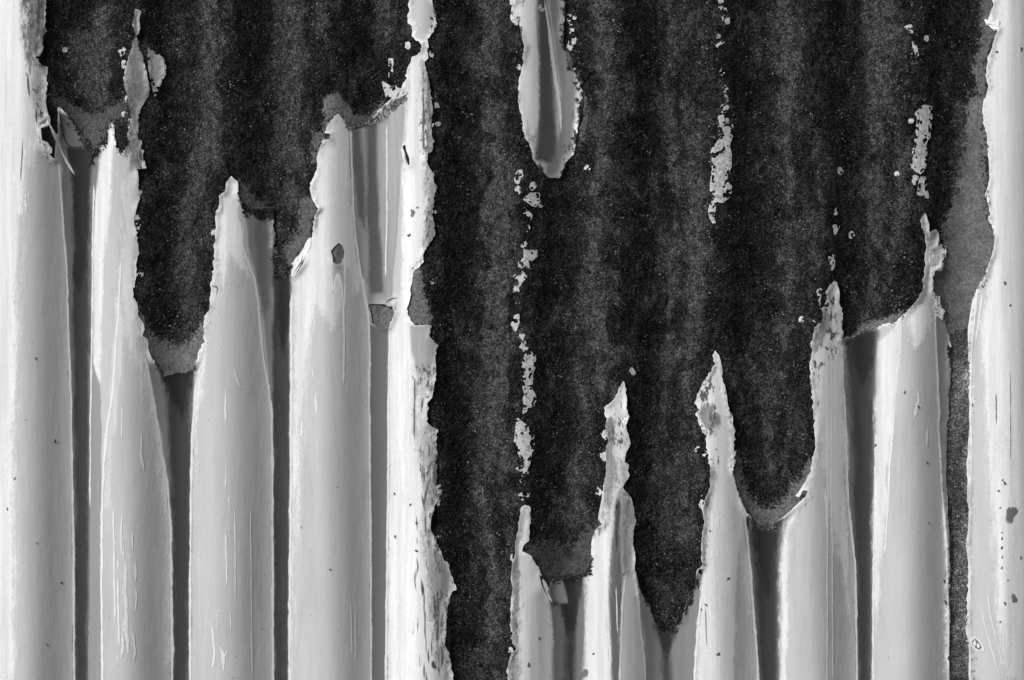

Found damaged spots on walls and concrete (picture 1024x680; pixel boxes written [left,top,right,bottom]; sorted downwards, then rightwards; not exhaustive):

peeling [22,0,56,158]
peeling [124,9,149,170]
peeling [411,63,437,245]
rust [36,0,422,680]
peeling [331,243,344,265]
peeling [368,304,394,328]
peeling [409,364,447,680]
peeling [604,390,635,571]
rust [407,0,999,680]
peeling [699,375,720,441]
peeling [812,296,840,388]
peeling [508,536,530,680]